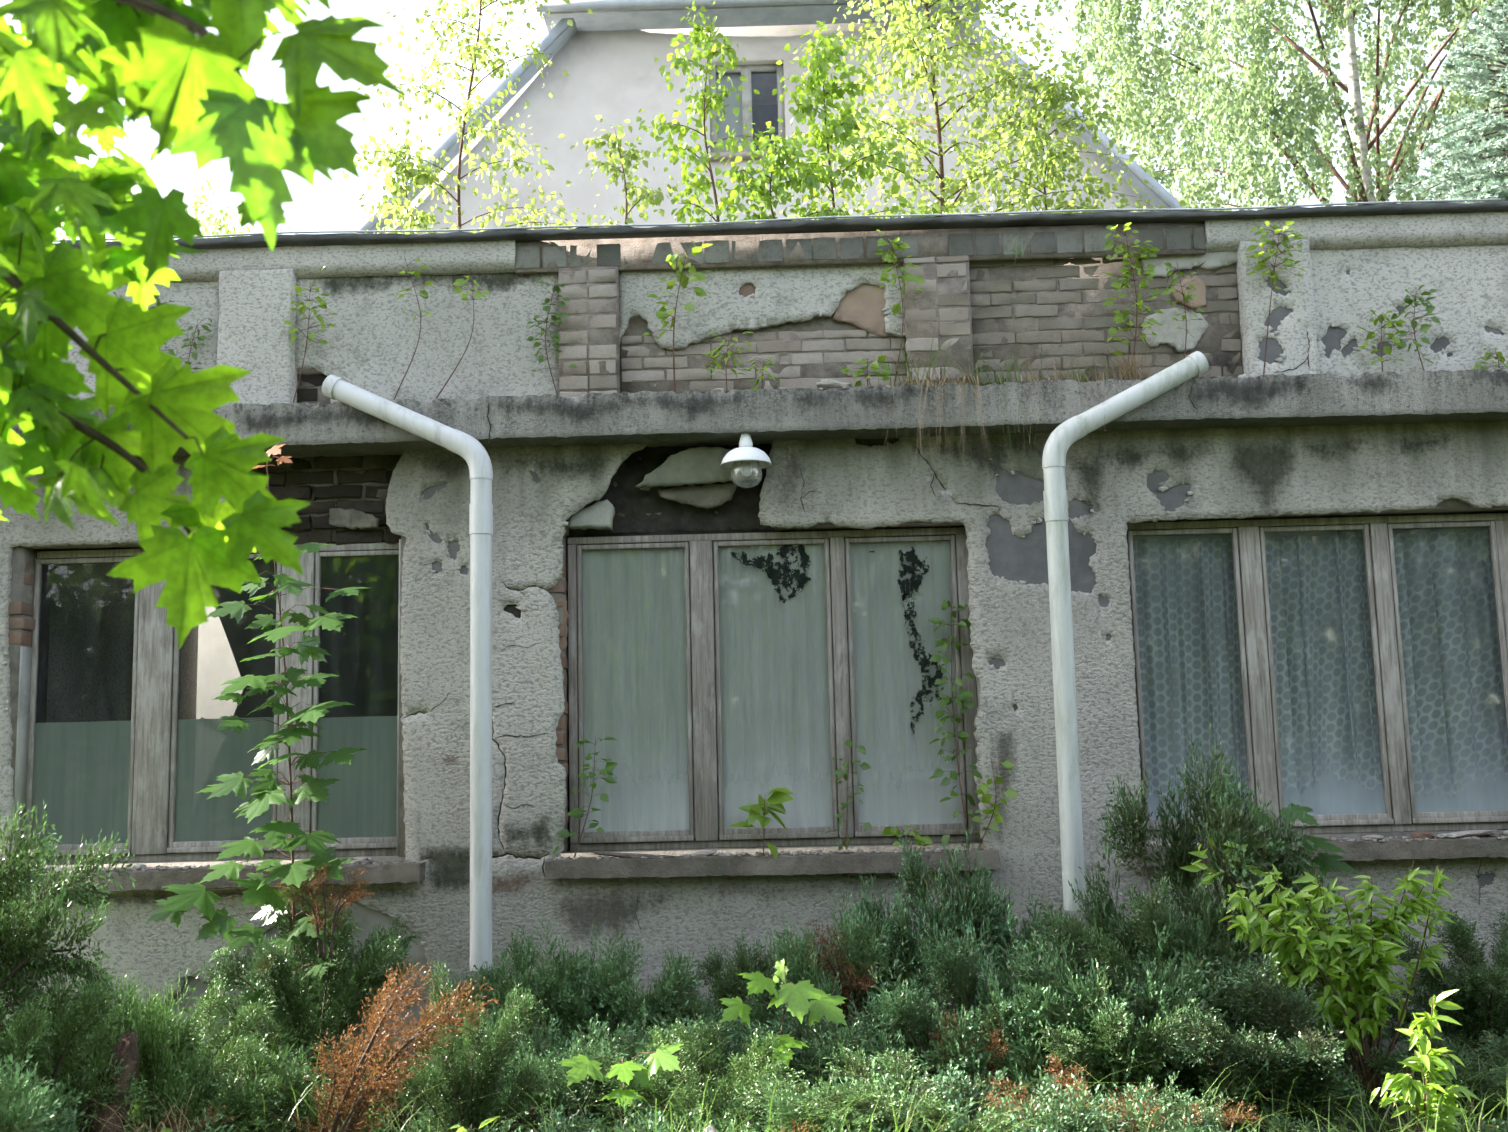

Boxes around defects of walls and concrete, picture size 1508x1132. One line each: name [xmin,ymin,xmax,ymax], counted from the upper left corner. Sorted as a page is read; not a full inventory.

spalling [739,283,756,298]
spalling [1257,276,1294,364]
spalling [1317,324,1392,358]
spalling [1430,337,1453,357]
spalling [1147,470,1193,514]
spalling [985,458,1049,585]
spalling [1068,498,1110,607]
crack [501,582,548,595]
crack [492,702,547,877]